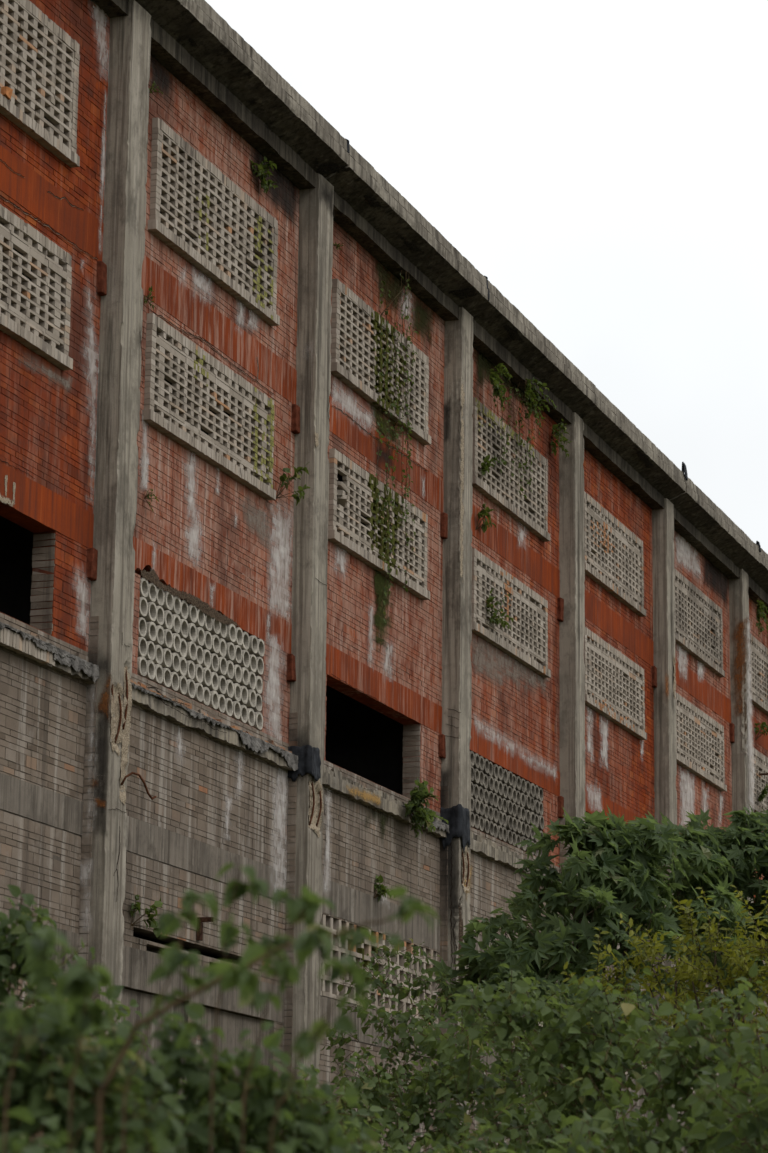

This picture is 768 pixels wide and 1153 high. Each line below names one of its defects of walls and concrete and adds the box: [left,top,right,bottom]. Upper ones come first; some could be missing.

crack [0,159,98,260]
spalling [0,475,16,506]
leakage [187,456,199,557]